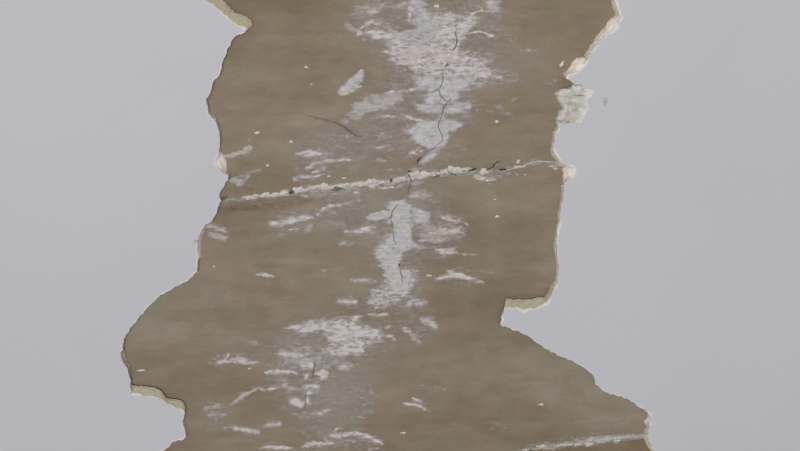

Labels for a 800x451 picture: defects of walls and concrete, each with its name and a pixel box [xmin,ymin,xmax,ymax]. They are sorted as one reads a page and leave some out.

leakage [340,0,518,165]
efflorescence [293,135,355,181]
crack [221,31,562,245]
flaking render [119,0,653,451]
efflorescence [436,267,484,283]
efflorescence [260,191,468,418]
efflorescence [215,353,258,364]
leakage [204,403,281,434]
efflorescence [262,426,383,451]